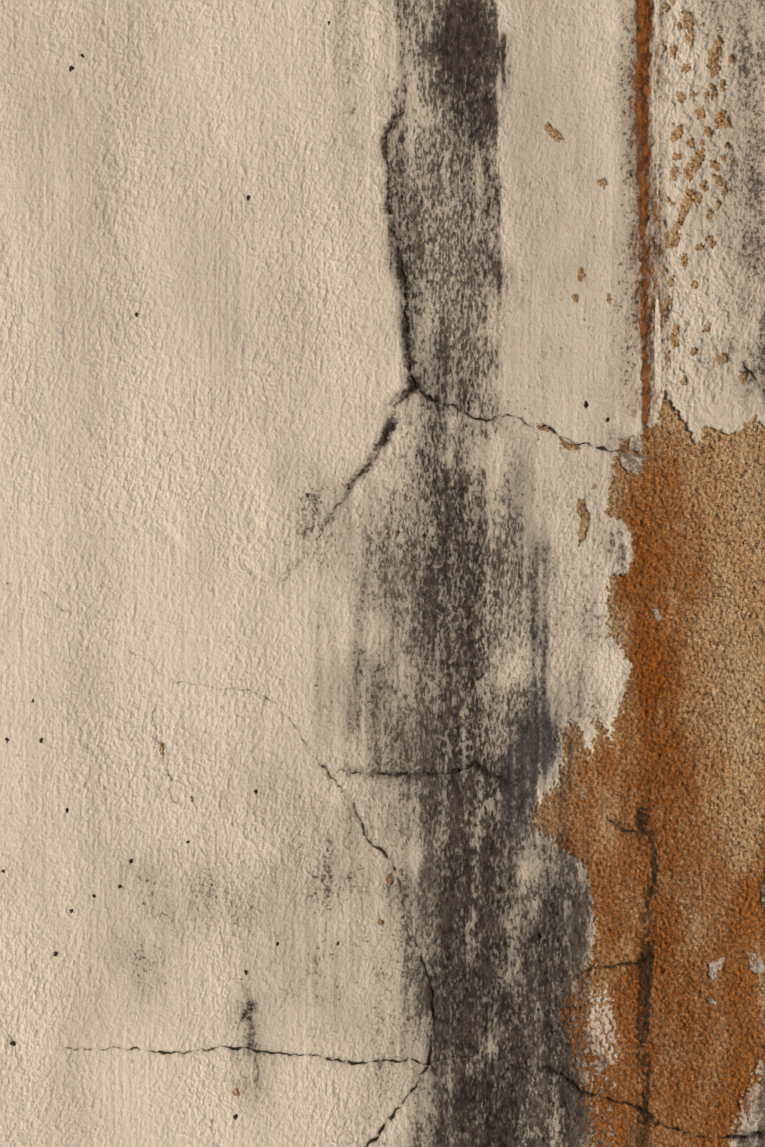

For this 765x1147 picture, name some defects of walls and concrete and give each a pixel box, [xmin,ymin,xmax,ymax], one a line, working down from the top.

leakage [138,866,256,937]
crack [69,725,765,1147]
leakage [278,0,658,1147]
crack [319,1,618,537]
peeling [495,385,765,1147]
corrosion [560,0,765,1147]
peeling [663,0,705,73]
peeling [663,36,737,366]
leakage [704,0,765,404]
crack [730,344,765,393]